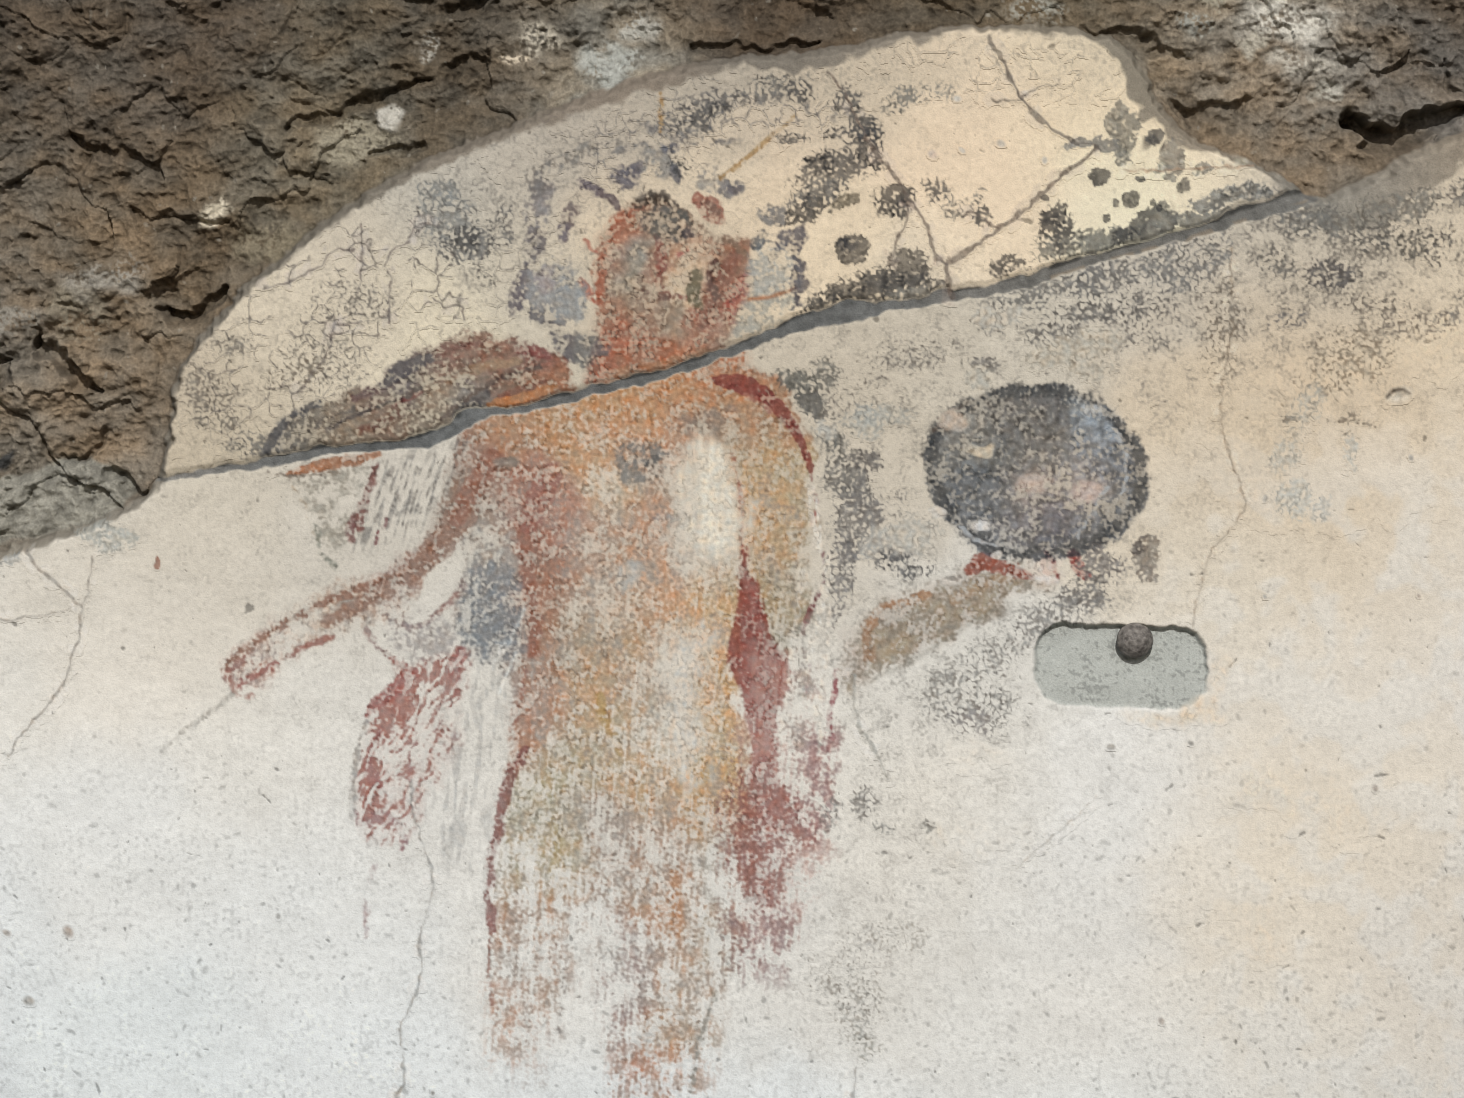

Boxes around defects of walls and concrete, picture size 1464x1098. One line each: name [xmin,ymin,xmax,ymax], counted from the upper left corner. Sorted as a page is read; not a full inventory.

damp [643,66,994,230]
spalling [1339,102,1464,159]
spalling [32,338,105,394]
spalling [155,284,230,331]
crack [169,26,1258,480]
damp [765,96,1464,549]
crack [1185,240,1254,629]
peeling [1262,377,1335,524]
peeling [71,512,141,560]
crack [0,542,101,768]
spalling [1034,623,1208,711]
crack [385,776,442,1098]